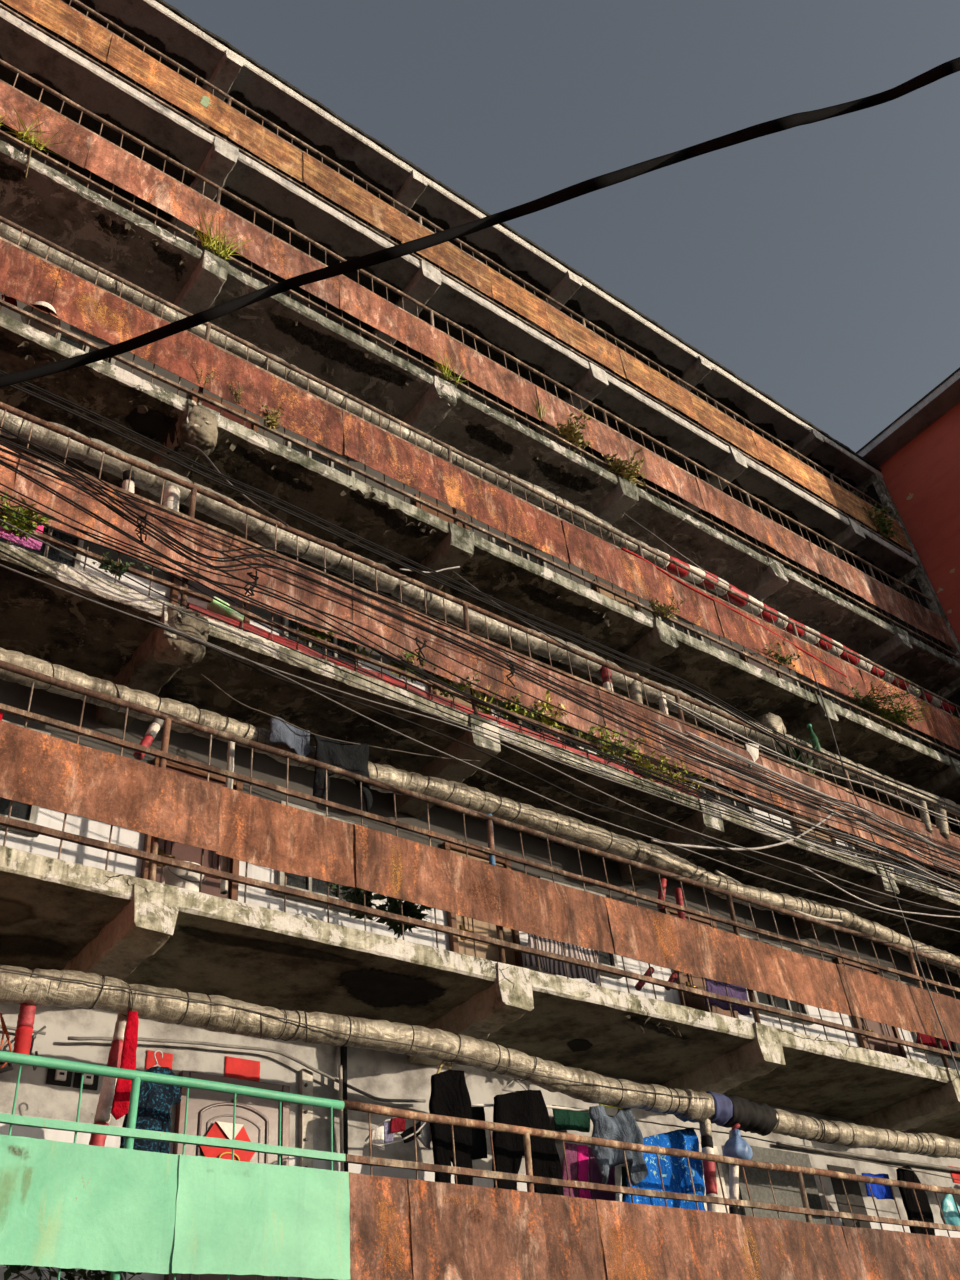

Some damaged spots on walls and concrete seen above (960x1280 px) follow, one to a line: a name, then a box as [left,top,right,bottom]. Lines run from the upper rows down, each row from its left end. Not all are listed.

damp [0,898,68,958]